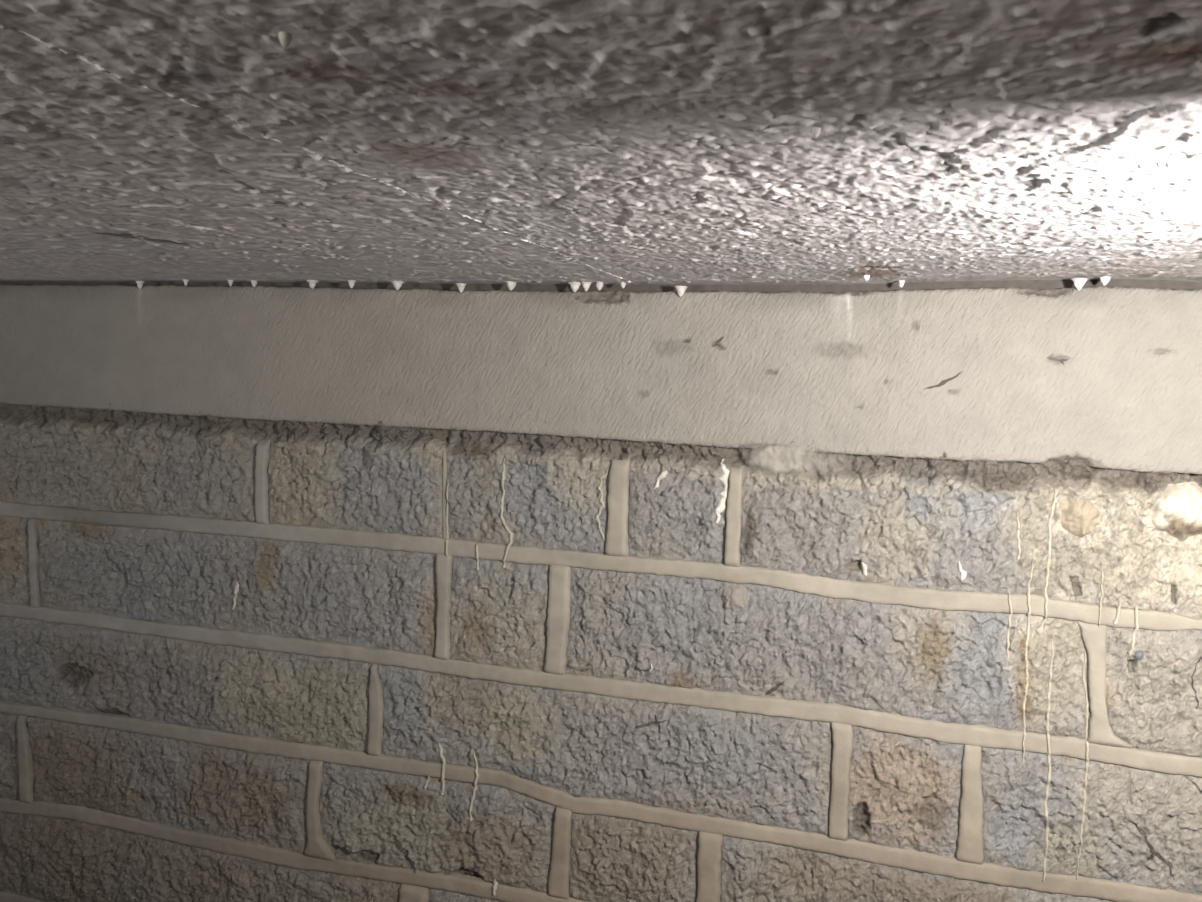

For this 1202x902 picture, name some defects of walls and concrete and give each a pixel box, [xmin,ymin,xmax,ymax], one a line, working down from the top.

spalling [1049,457,1100,478]
damp [1006,487,1056,881]
damp [1076,650,1089,879]
damp [1098,562,1139,655]